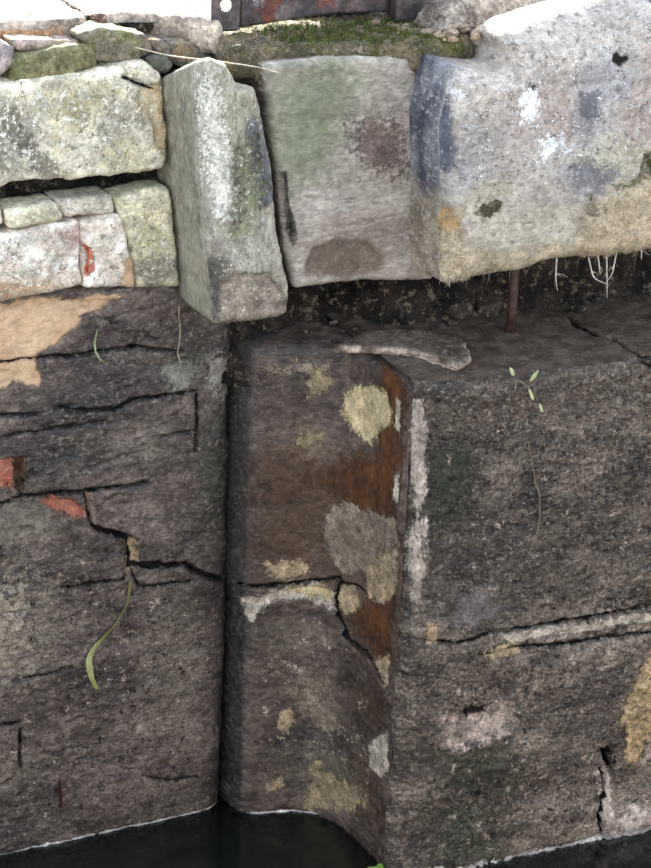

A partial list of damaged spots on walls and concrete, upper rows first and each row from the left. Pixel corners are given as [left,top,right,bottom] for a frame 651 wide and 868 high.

rust [255,0,283,24]
crack [0,345,175,363]
crack [0,389,199,451]
crack [429,603,651,655]
crack [596,746,610,831]